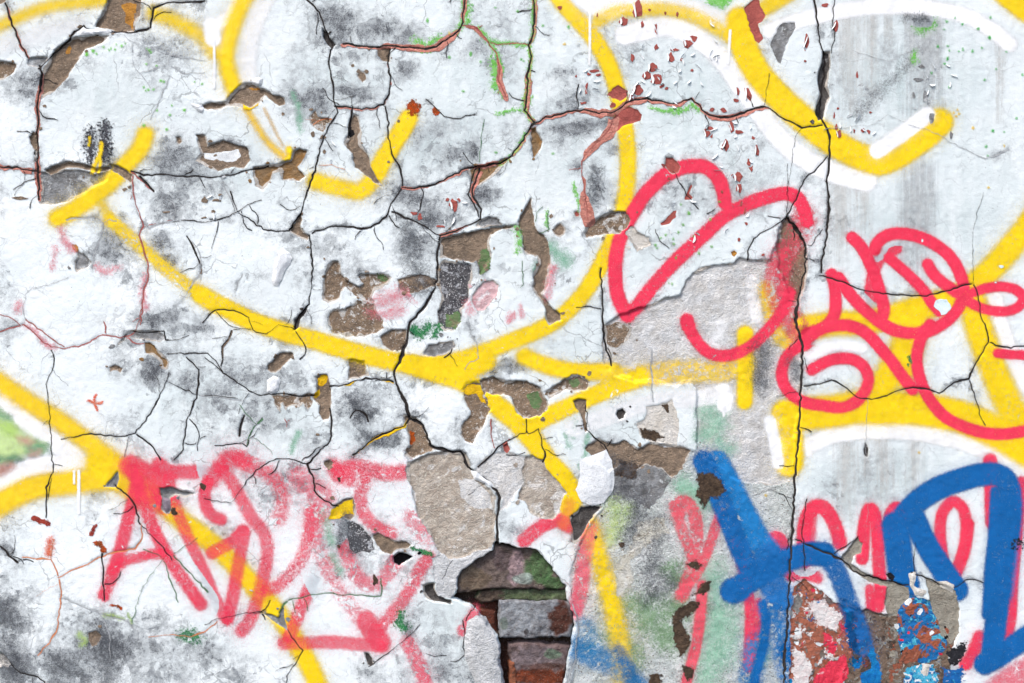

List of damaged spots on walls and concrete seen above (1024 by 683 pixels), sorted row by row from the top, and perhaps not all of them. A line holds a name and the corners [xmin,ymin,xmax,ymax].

spalling [0,0,141,107]
spalling [11,127,133,205]
spalling [190,77,285,116]
spalling [196,134,307,190]
peeling [575,0,703,131]
crack [0,0,822,471]
crack [747,0,1024,683]
crack [42,411,63,518]
crack [61,309,339,507]
crack [468,476,501,543]
spalling [322,198,968,683]
crack [0,485,383,683]